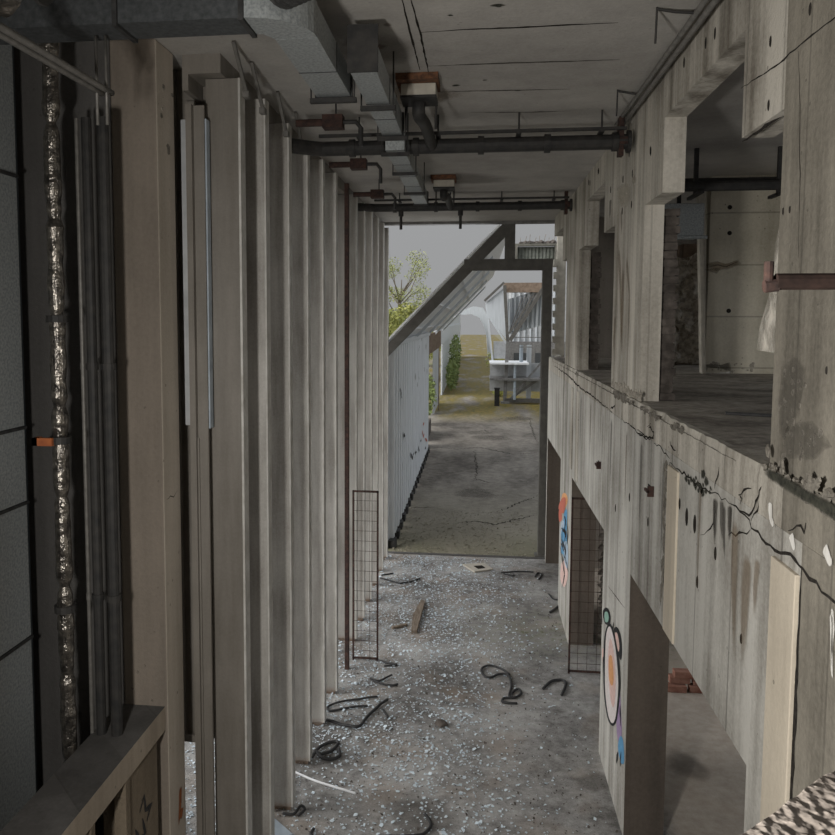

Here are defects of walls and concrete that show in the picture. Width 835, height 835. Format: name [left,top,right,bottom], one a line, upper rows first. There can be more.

crack [743,17,835,100]
crack [742,117,780,142]
crack [796,127,804,208]
spalling [761,444,835,521]
crack [554,362,835,800]